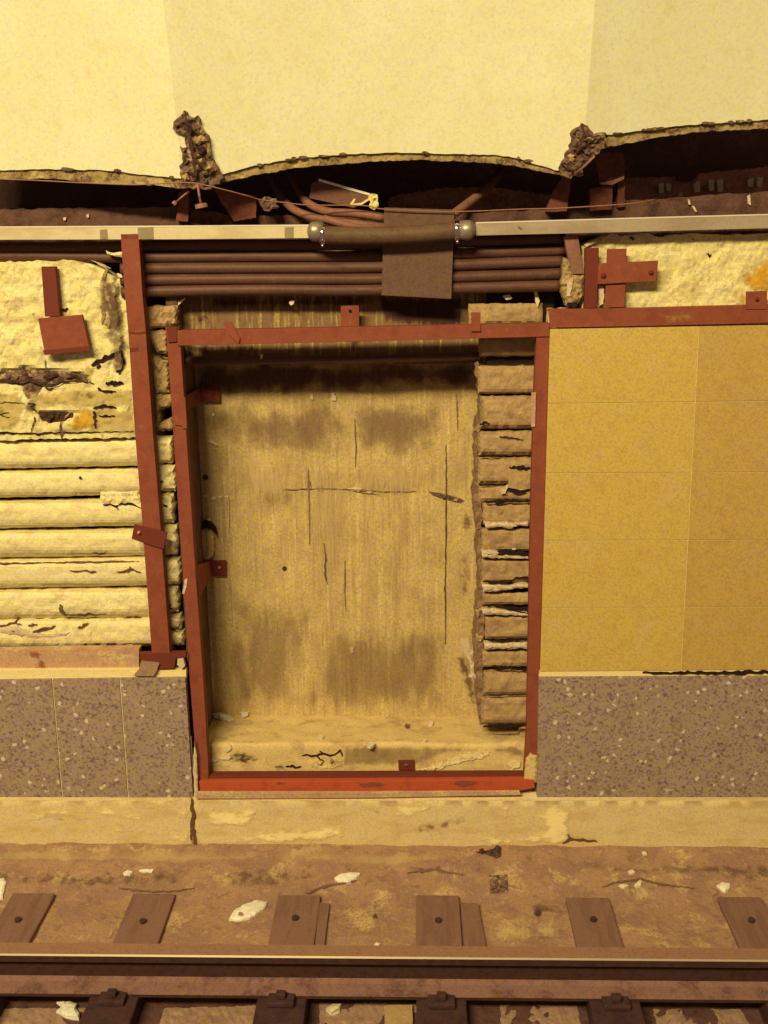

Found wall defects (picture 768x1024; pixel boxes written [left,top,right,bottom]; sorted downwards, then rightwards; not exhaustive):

peeling [180,135,208,182]
peeling [561,131,601,174]
spalling [0,367,91,399]
spalling [39,411,74,423]
flaking render [499,471,530,494]
crack [282,471,412,611]
spalling [429,360,512,725]
water stain [459,658,474,697]
crack [286,749,343,768]
crack [189,799,197,845]